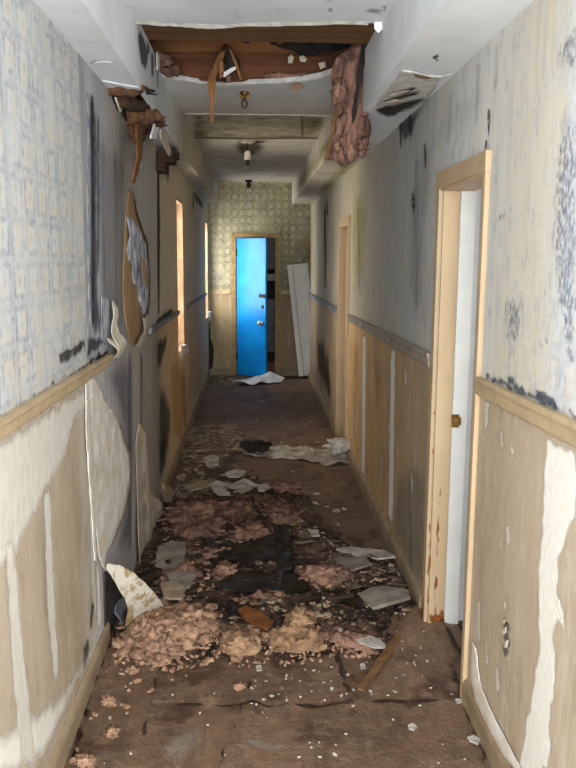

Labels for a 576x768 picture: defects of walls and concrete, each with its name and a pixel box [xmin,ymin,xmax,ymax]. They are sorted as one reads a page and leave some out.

spalling [102,80,171,184]
peeling [375,70,452,112]
water stain [91,96,99,328]
water stain [60,337,108,375]
water stain [486,373,558,410]
peeling [0,378,131,763]
peeling [471,601,522,768]